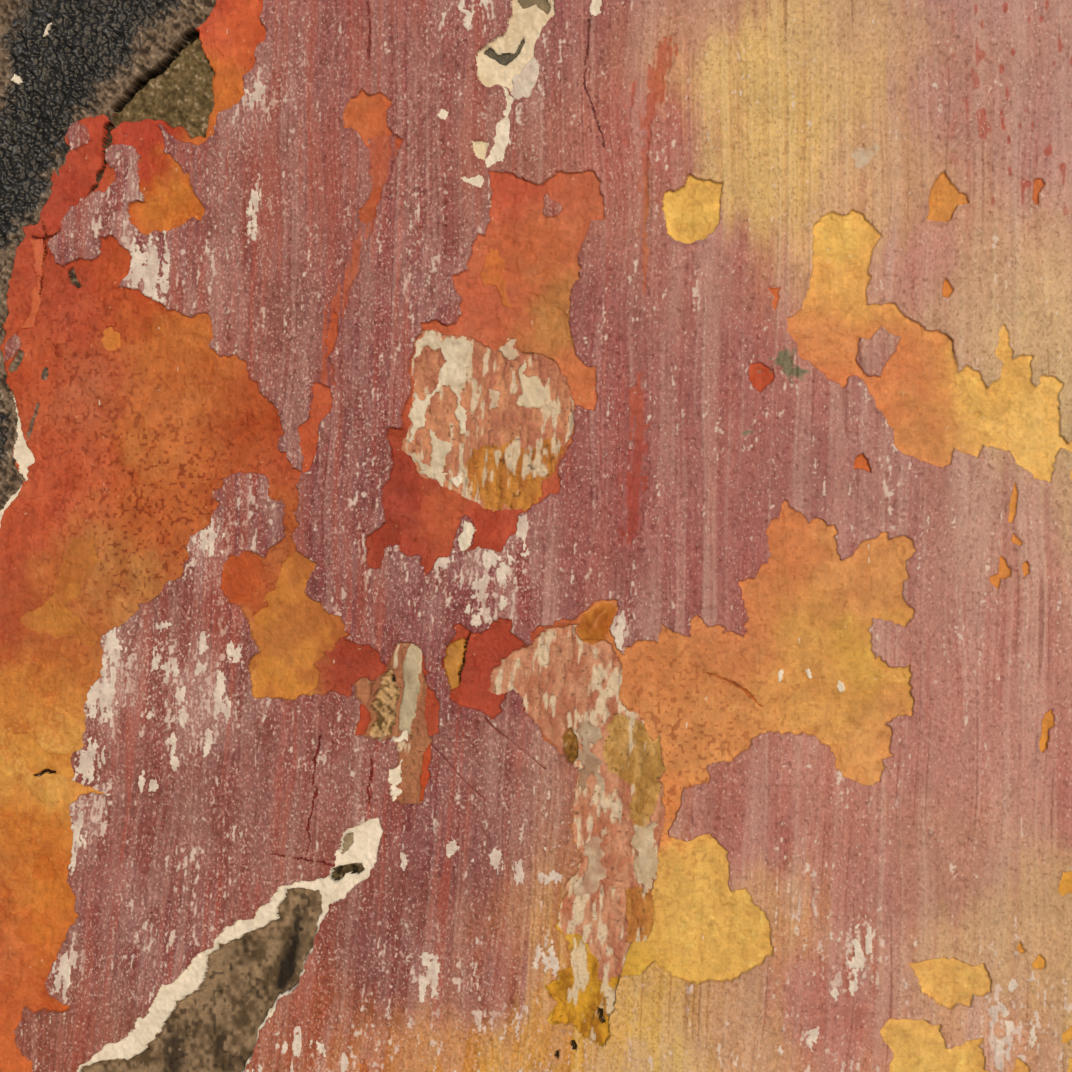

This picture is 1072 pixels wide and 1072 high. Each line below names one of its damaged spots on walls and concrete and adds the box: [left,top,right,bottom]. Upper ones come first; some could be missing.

crack [89,28,200,194]
peeling [927,172,969,222]
peeling [1032,178,1046,205]
peeling [786,210,1072,482]
peeling [0,0,440,1072]
peeling [365,0,916,1050]
peeling [1008,483,1023,546]
peeling [990,556,1029,589]
peeling [1039,710,1055,752]
peeling [1058,871,1072,896]
peeling [1008,942,1046,992]
peeling [880,957,1009,1072]